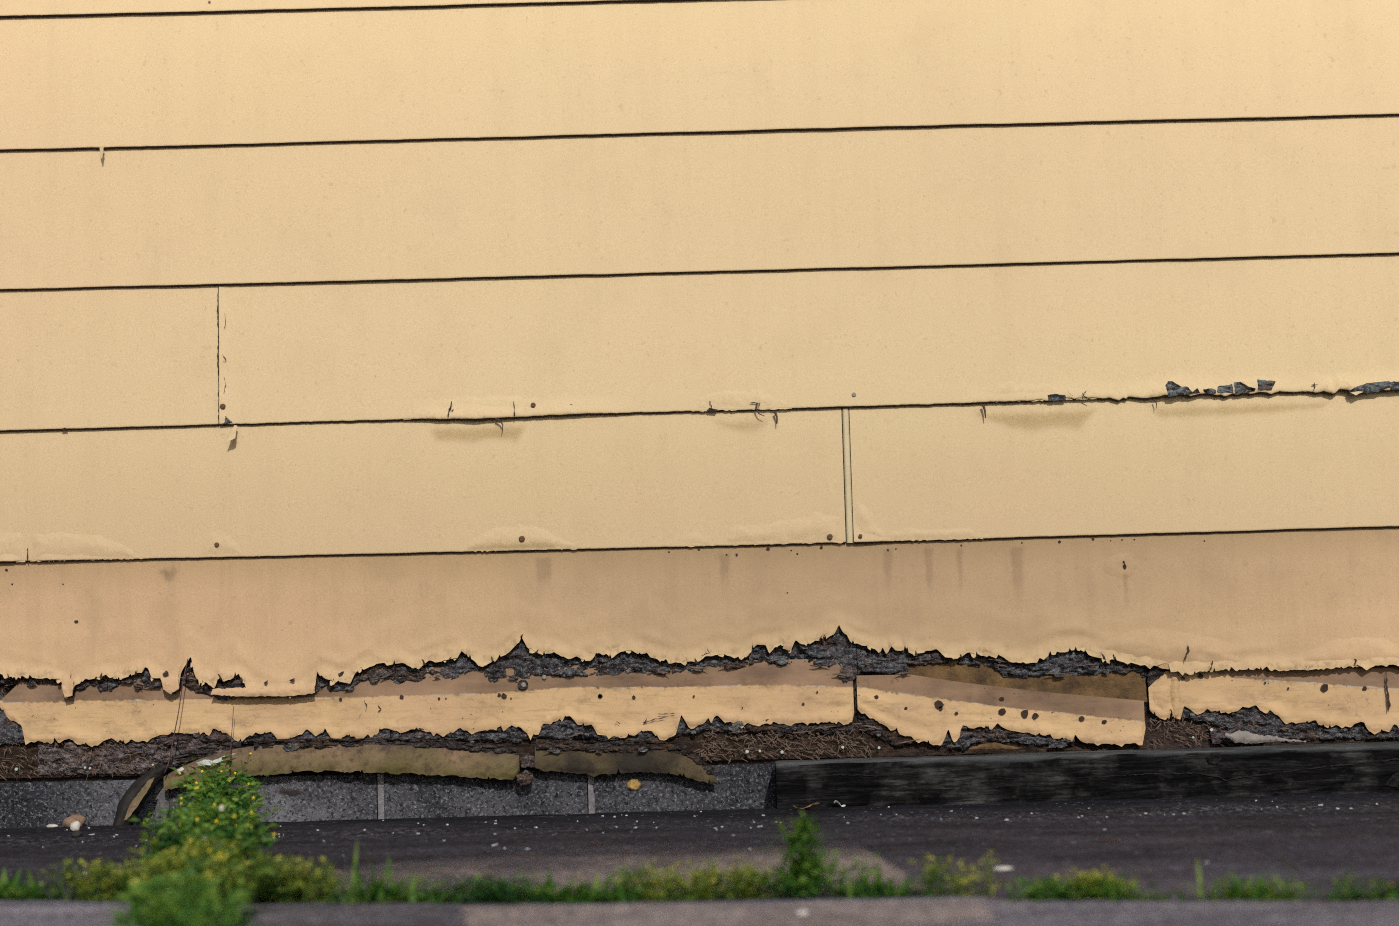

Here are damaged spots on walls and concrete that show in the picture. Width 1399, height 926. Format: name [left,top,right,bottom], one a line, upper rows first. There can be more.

peeling [1154,379,1276,409]
peeling [1349,381,1399,395]
peeling [0,626,1164,790]
spalling [1181,705,1399,744]